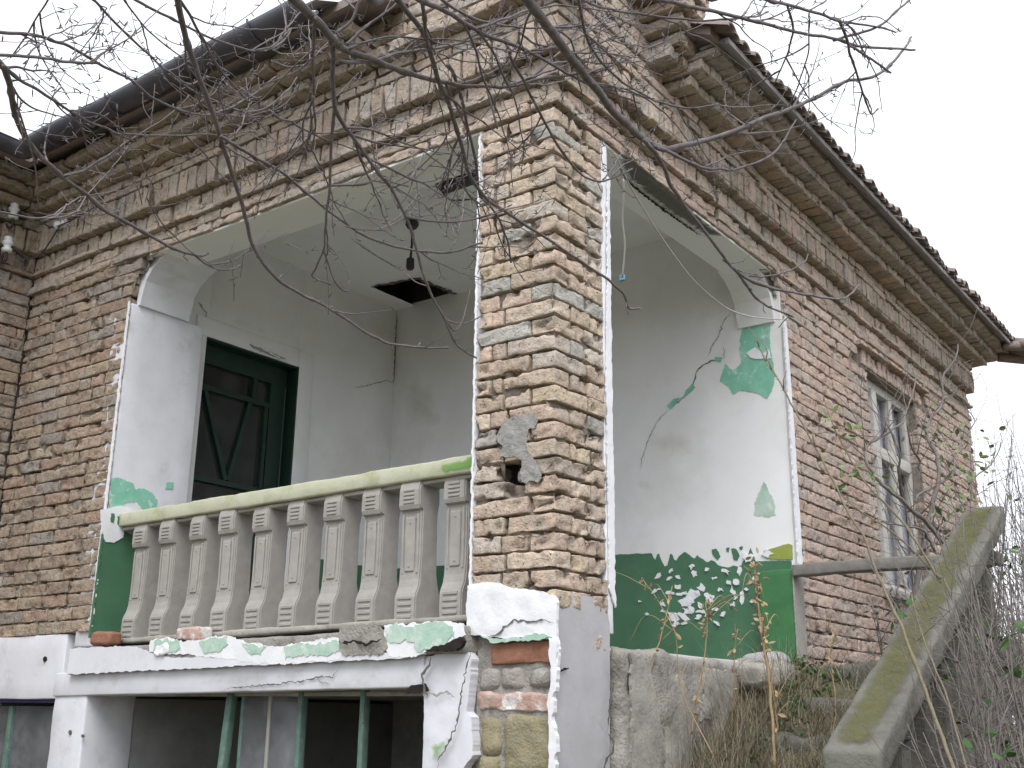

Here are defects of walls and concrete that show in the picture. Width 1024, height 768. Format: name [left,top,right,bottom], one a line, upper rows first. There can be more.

crack [641,312,731,466]
peeling [720,325,775,398]
peeling [100,477,174,543]
peeling [754,482,776,518]
peeling [638,544,793,627]
peeling [149,621,466,665]
crack [421,619,549,768]